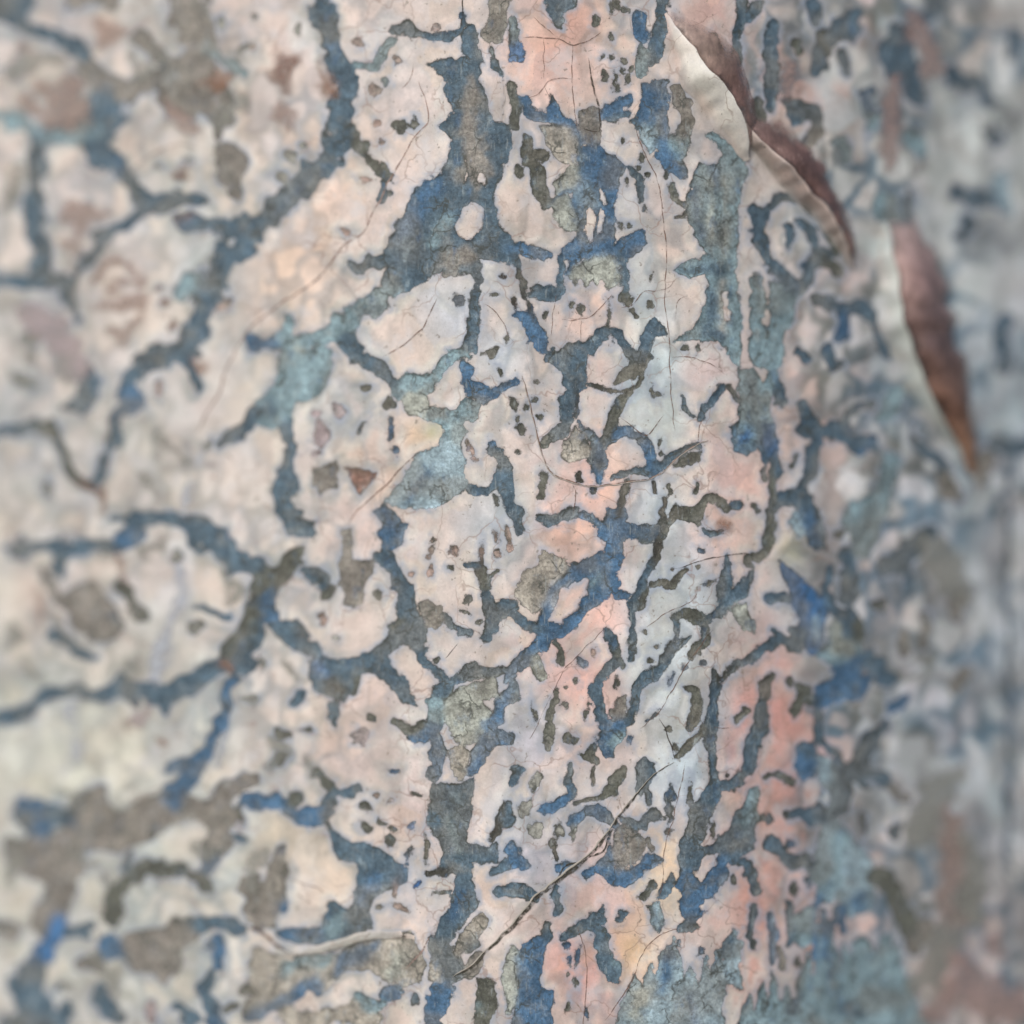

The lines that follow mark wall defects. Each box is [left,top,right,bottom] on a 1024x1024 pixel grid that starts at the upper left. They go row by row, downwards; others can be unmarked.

peeling [732,0,863,165]
peeling [878,21,927,106]
peeling [872,187,913,229]
peeling [810,293,893,372]
peeling [992,313,1016,375]
peeling [580,131,879,787]
peeling [909,419,967,505]
peeling [972,435,1024,487]
peeling [0,0,758,1024]
peeling [638,452,939,1024]
crack [454,632,711,976]
crack [578,929,676,1021]